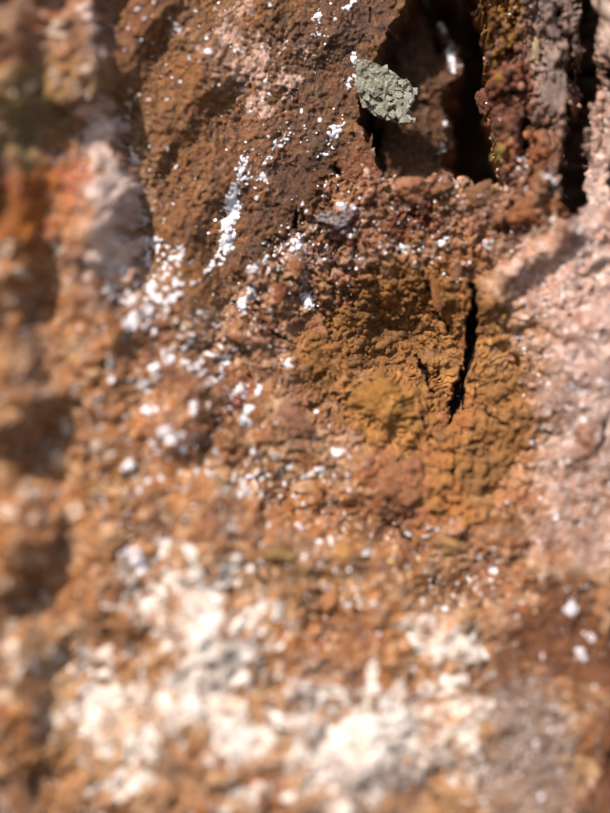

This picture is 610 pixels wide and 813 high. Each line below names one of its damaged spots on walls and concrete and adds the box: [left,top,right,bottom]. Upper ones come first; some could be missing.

water stain [101,126,310,430]
efflorescence [285,228,333,318]
efflorescence [81,359,117,463]
efflorescence [121,458,137,473]
efflorescence [140,405,354,507]
crack [416,356,431,391]
crack [448,284,479,423]
efflorescence [0,503,50,524]
efflorescence [63,503,83,520]
efflorescence [300,526,344,573]
efflorescence [403,526,440,546]
water stain [0,534,520,813]